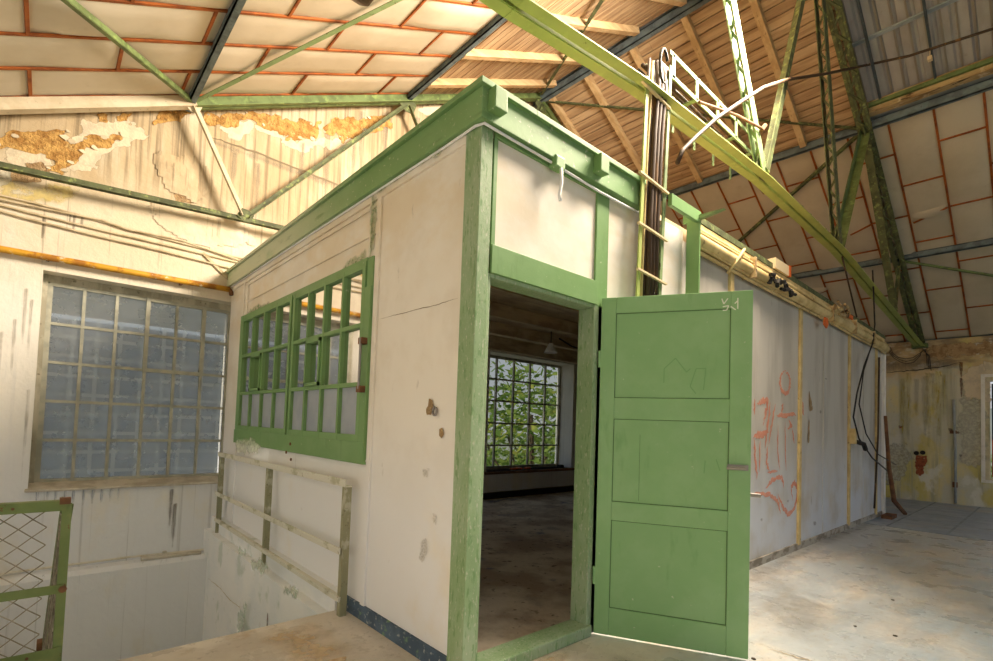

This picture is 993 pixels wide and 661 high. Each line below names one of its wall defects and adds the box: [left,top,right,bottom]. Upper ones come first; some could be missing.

spalling [0,110,191,195]
spalling [203,111,393,153]
leakage [2,181,72,201]